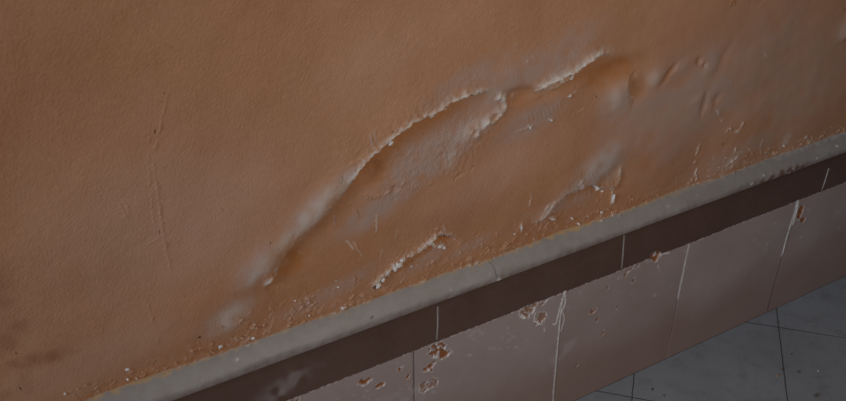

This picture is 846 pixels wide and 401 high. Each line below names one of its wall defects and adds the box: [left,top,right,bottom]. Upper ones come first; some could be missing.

flaking render [331,44,644,228]
flaking render [45,148,664,401]
crack [551,290,567,401]